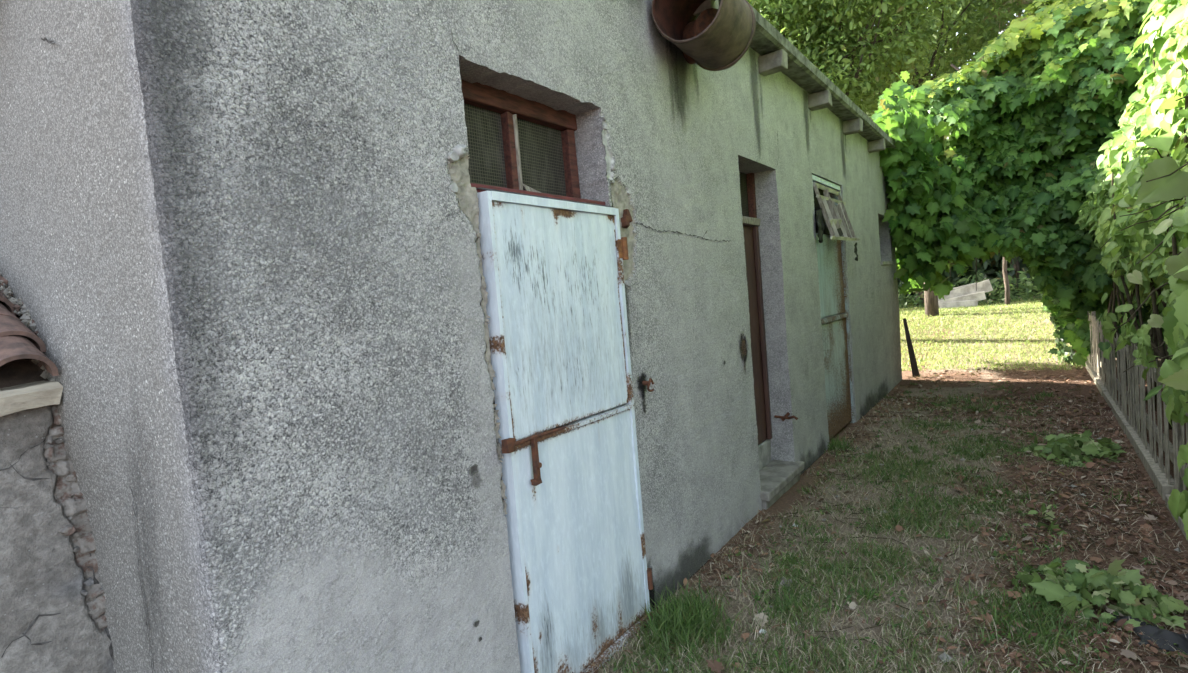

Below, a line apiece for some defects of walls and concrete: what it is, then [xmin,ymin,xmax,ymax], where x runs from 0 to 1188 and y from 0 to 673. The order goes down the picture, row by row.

spalling [600,115,637,287]
crack [636,223,731,254]
spalling [447,144,507,514]
crack [0,440,51,508]
crack [2,613,61,658]